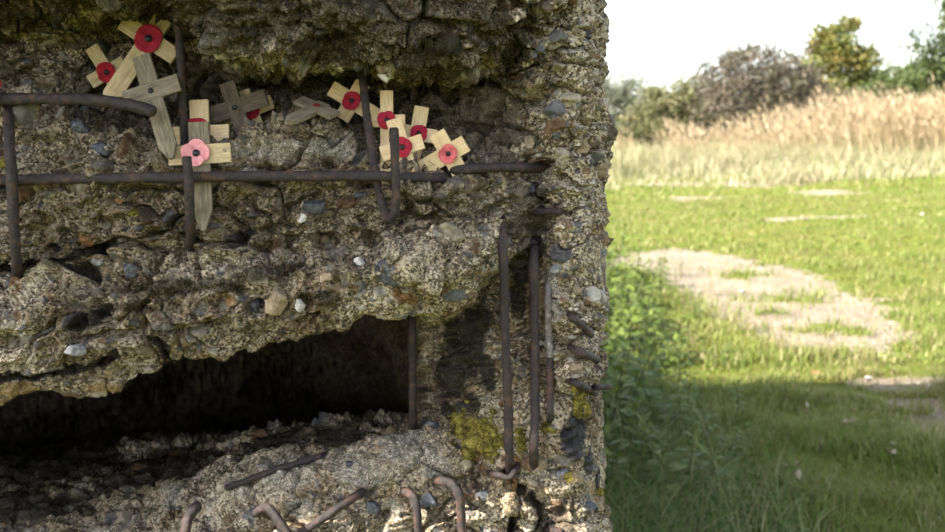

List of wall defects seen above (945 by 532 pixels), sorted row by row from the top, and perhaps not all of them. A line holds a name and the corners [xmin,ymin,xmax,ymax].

rust [0,25,550,294]
rust [566,312,595,338]
rust [486,215,554,492]
rust [567,344,601,364]
rust [569,378,612,396]
rust [224,451,327,491]
rust [180,501,202,532]
rust [251,487,367,532]
rust [431,475,467,532]